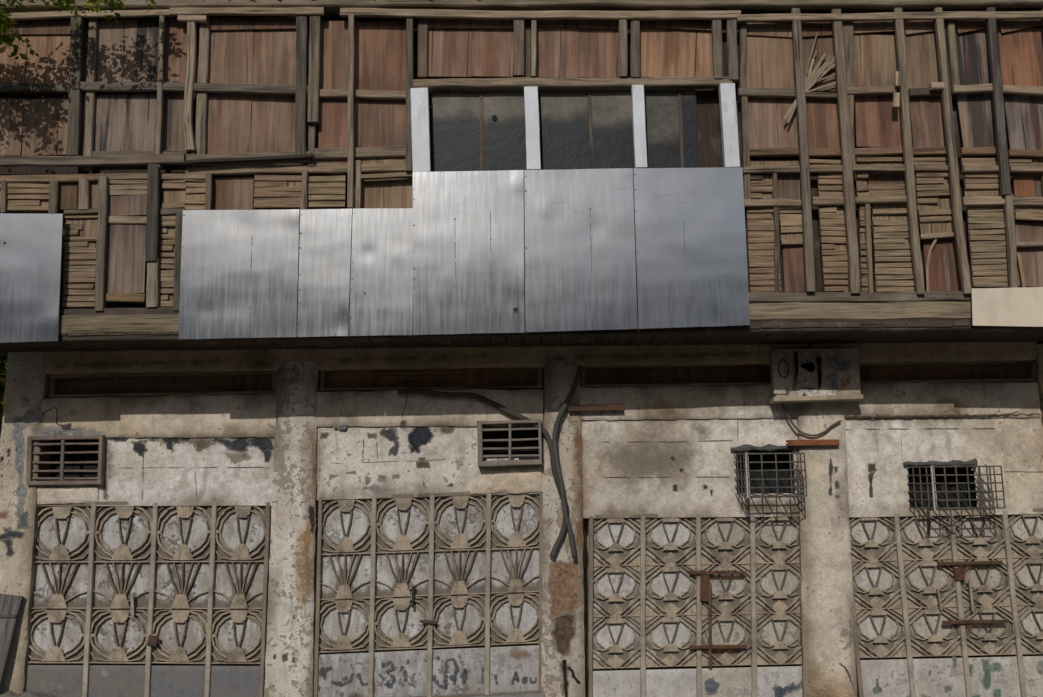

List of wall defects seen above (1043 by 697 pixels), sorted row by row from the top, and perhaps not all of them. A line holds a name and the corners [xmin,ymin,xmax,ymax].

peeling [0,408,274,530]
peeling [367,426,455,469]
spalling [546,560,582,655]
peeling [952,656,1002,697]